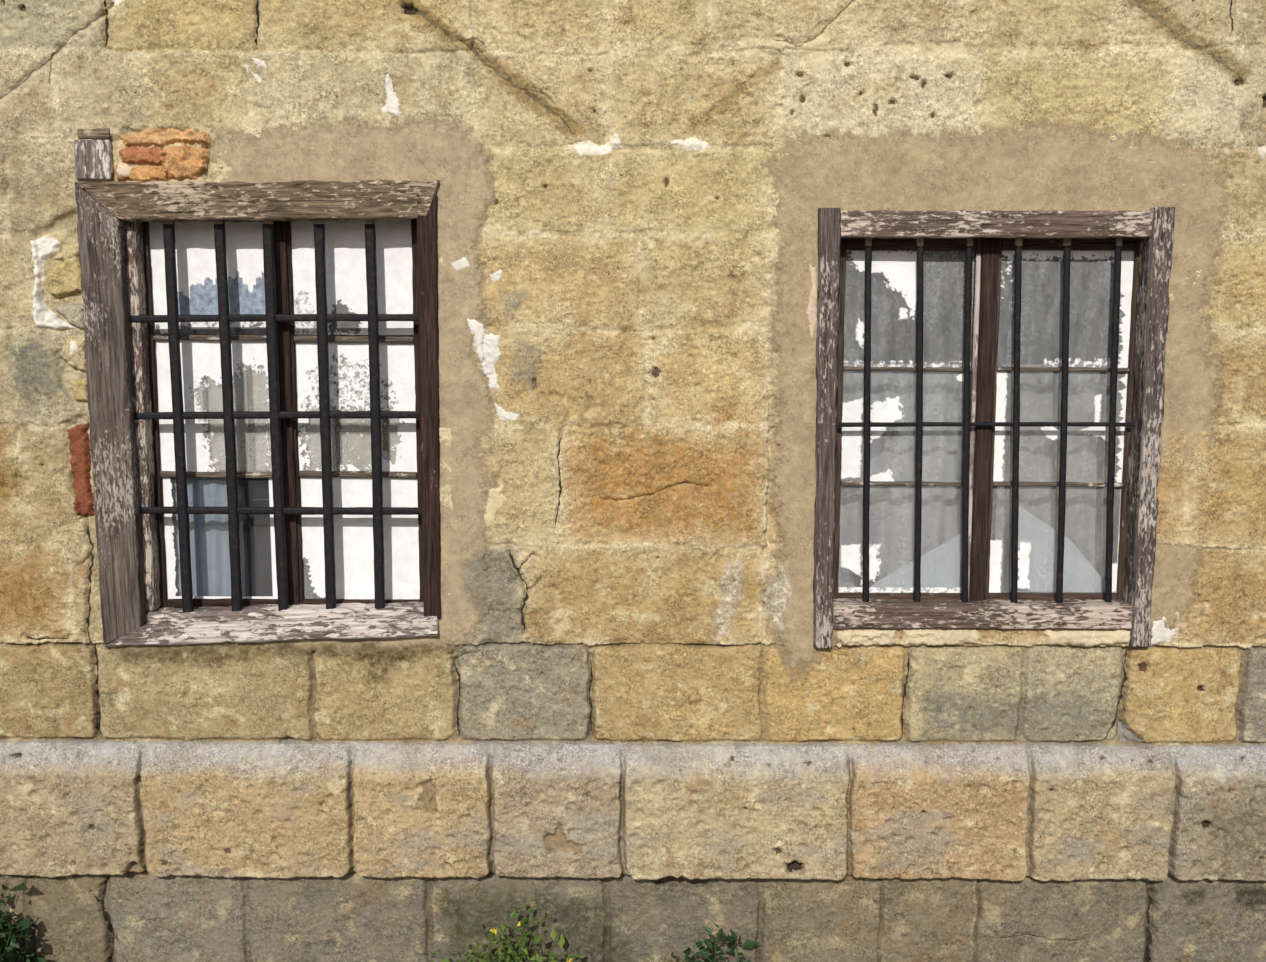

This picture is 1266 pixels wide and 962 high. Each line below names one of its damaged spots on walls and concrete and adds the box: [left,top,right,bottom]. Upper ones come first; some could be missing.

flaking render [115,128,212,182]
flaking render [30,236,87,402]
peeling [467,319,520,421]
flaking render [67,422,95,517]
crack [551,434,562,530]
crack [603,481,711,501]
crack [508,549,539,631]